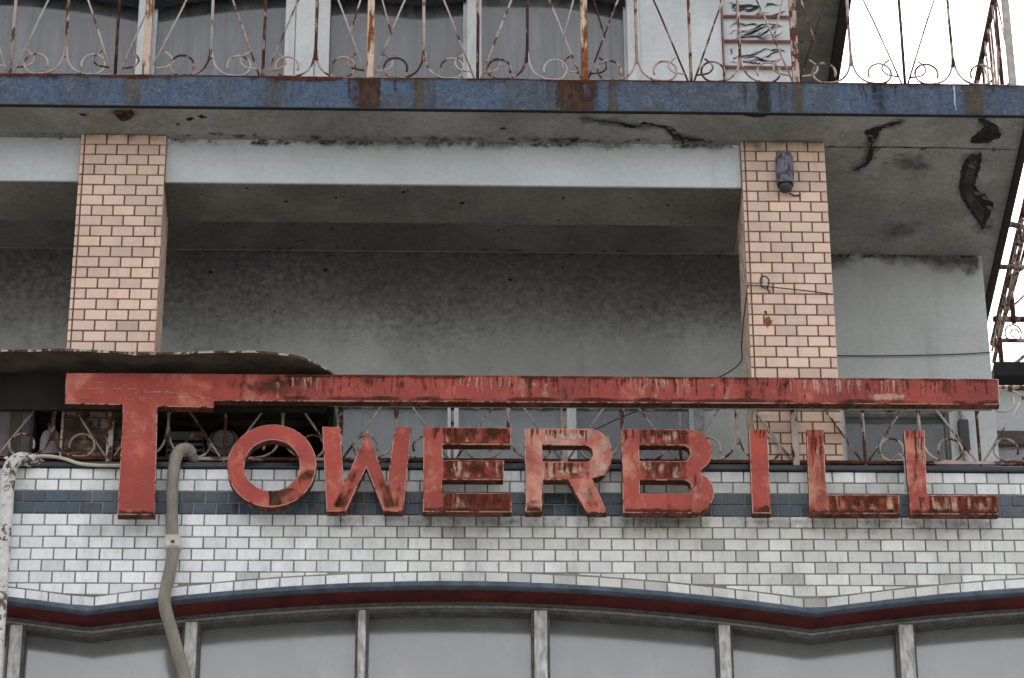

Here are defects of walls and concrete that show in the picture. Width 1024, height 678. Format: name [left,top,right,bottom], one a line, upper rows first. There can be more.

rust [248,76,412,107]
rust [555,80,597,110]
water stain [306,136,516,146]
water stain [532,137,640,147]
crack [583,117,697,144]
crack [828,120,1017,171]
flaking render [958,118,1001,230]
water stain [831,254,978,273]